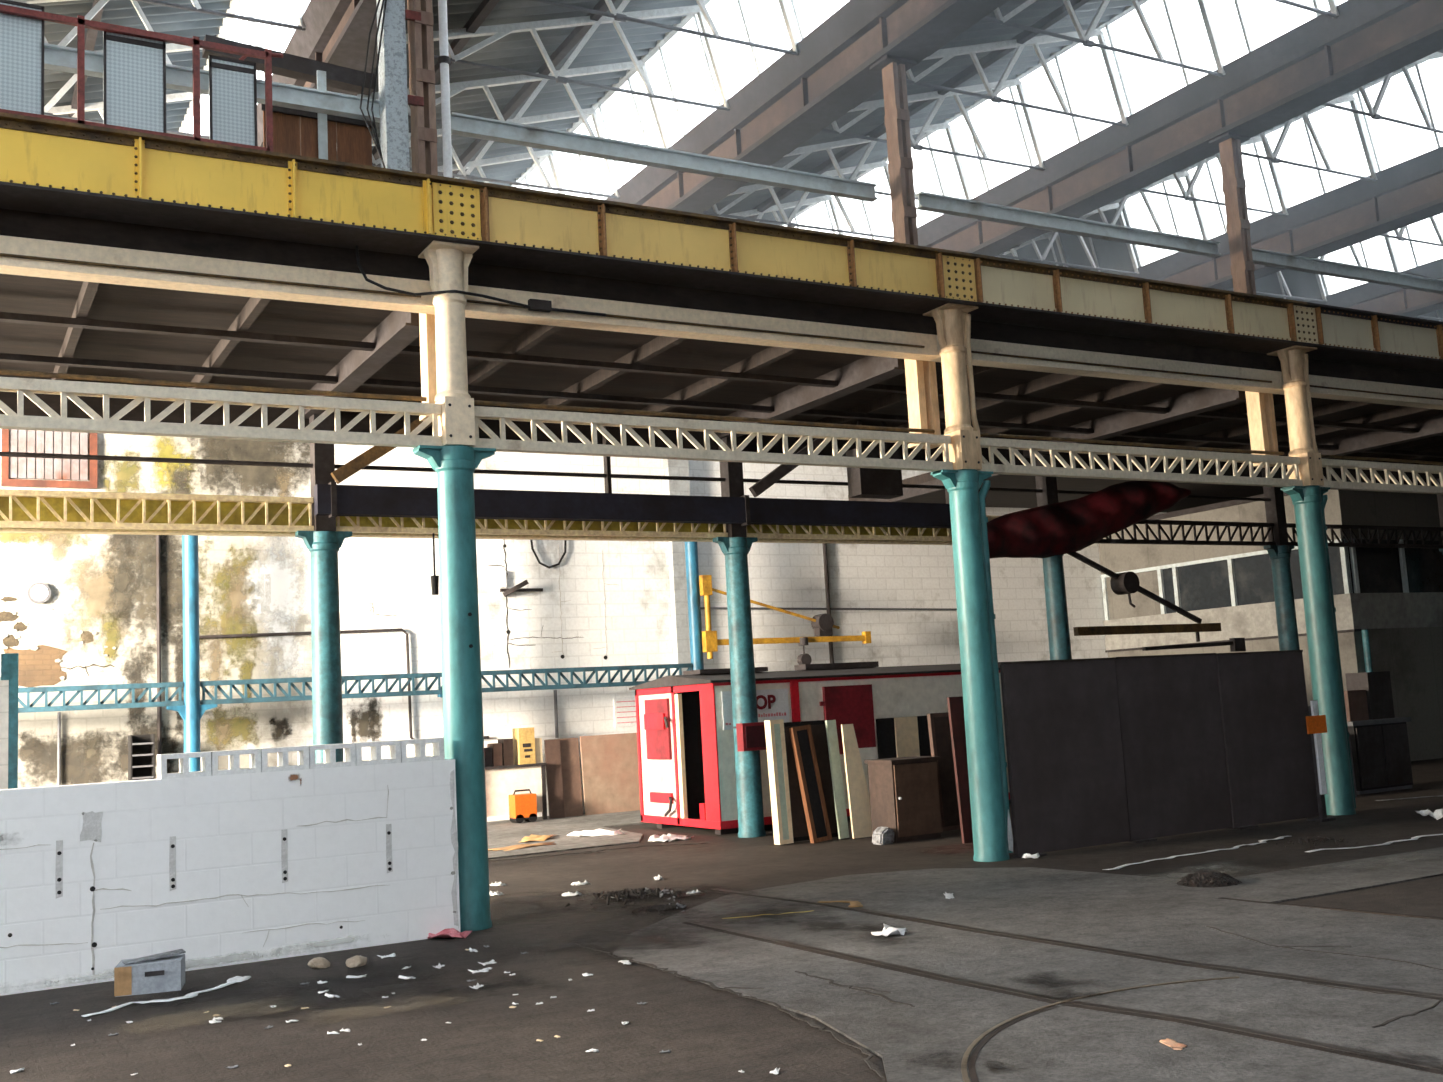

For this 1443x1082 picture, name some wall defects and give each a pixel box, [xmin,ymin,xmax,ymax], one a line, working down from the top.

leakage [100,452,140,493]
leakage [164,437,310,497]
peeling [0,542,80,612]
spalling [0,596,116,687]
leakage [18,534,231,787]
leakage [240,659,255,698]
crack [301,785,389,826]
crack [0,843,385,979]